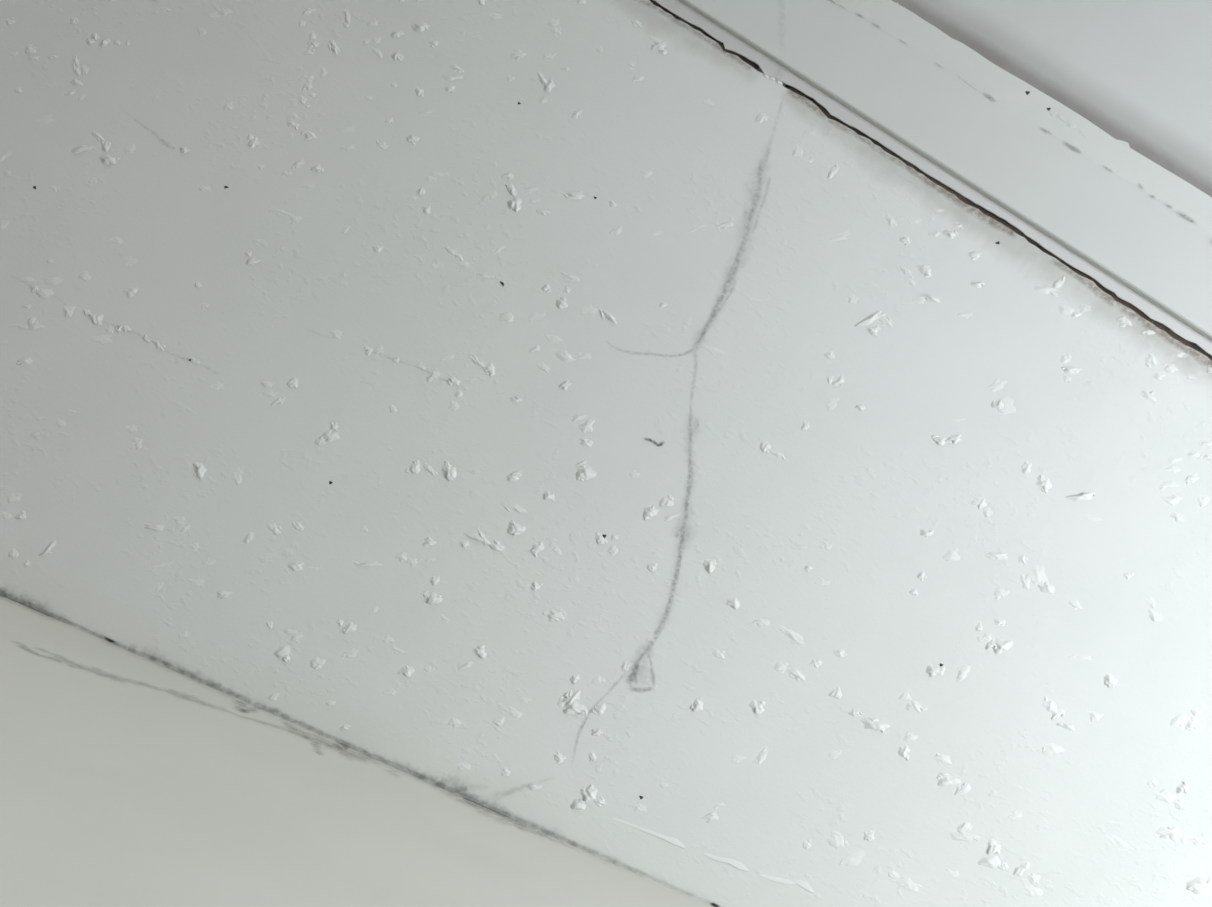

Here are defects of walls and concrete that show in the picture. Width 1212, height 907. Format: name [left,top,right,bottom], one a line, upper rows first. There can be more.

crack [650,0,759,70]
crack [785,85,1212,361]